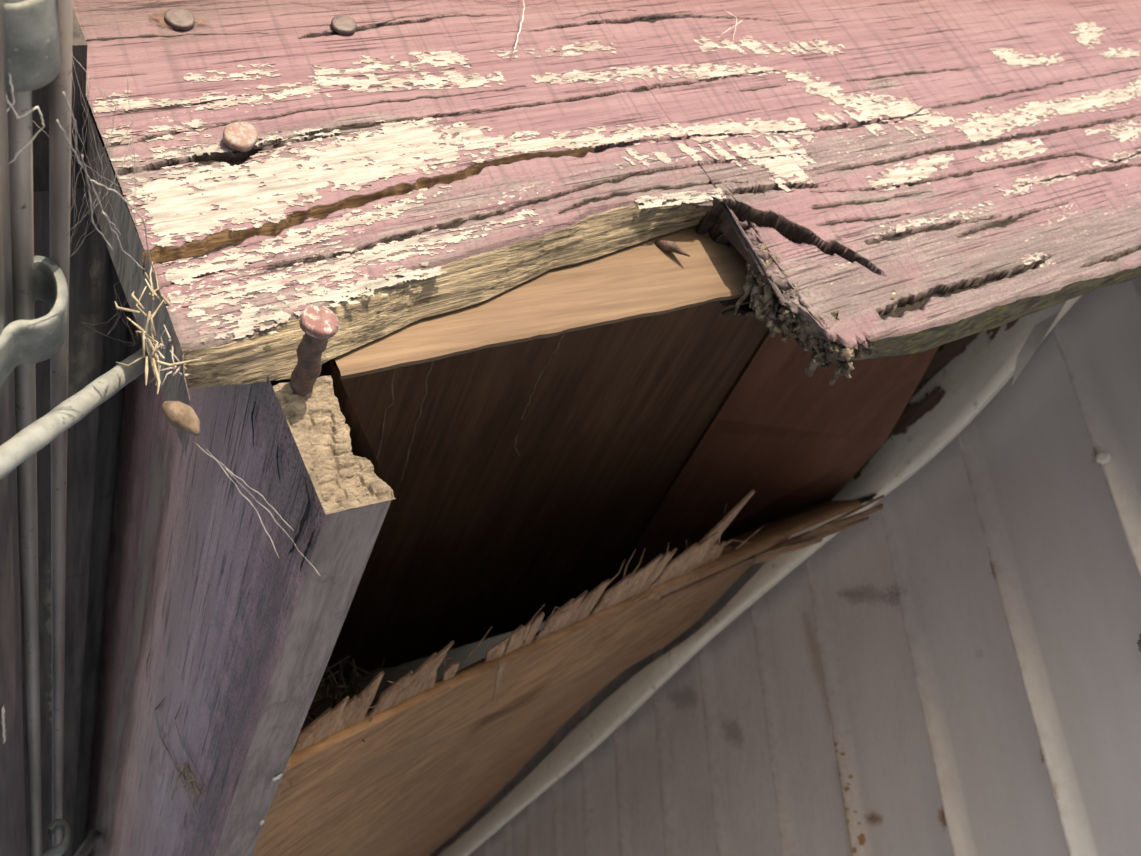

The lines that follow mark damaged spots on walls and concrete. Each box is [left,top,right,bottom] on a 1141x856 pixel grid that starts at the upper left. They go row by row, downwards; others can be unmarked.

crack [540,10,666,32]
peeling [1069,22,1141,58]
crack [806,67,1141,245]
crack [249,157,774,271]
spalling [93,35,1141,388]
crack [881,259,1046,320]
crack [1081,248,1141,268]
peeling [852,319,1019,480]
corrosion [839,772,881,853]